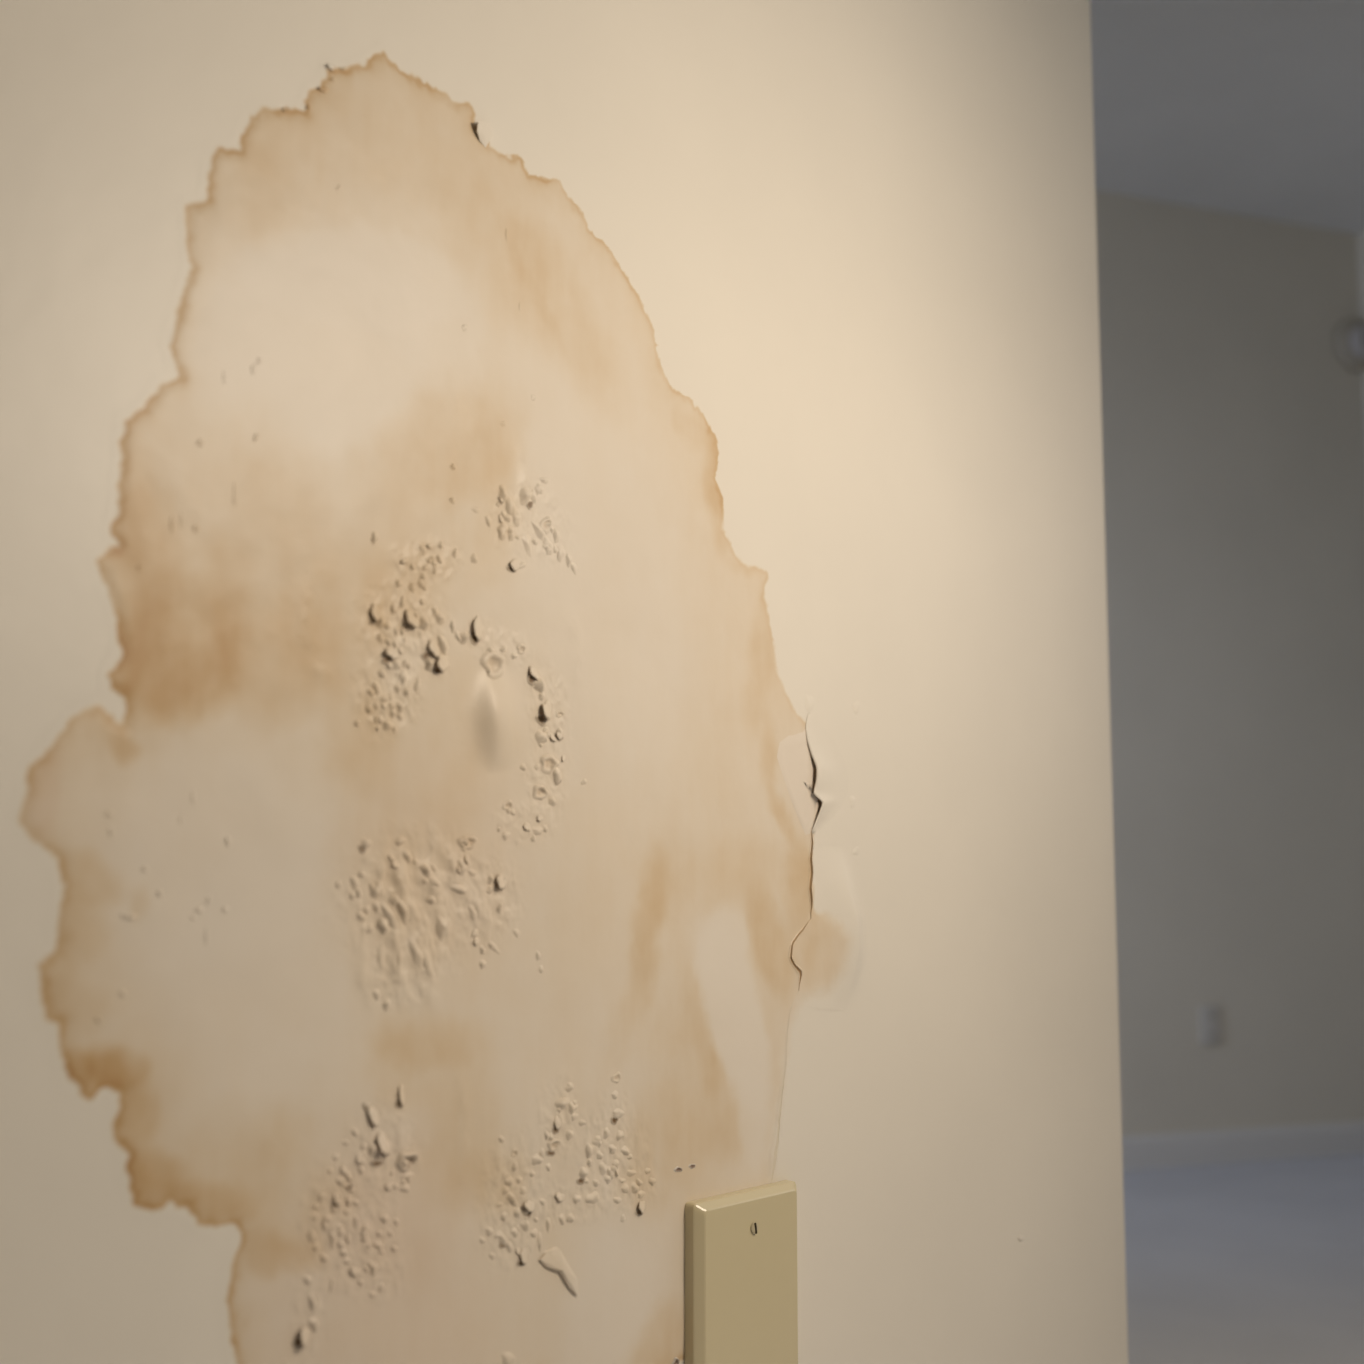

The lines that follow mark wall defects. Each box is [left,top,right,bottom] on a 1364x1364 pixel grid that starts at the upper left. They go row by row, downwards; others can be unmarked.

water stain [13,40,841,1364]